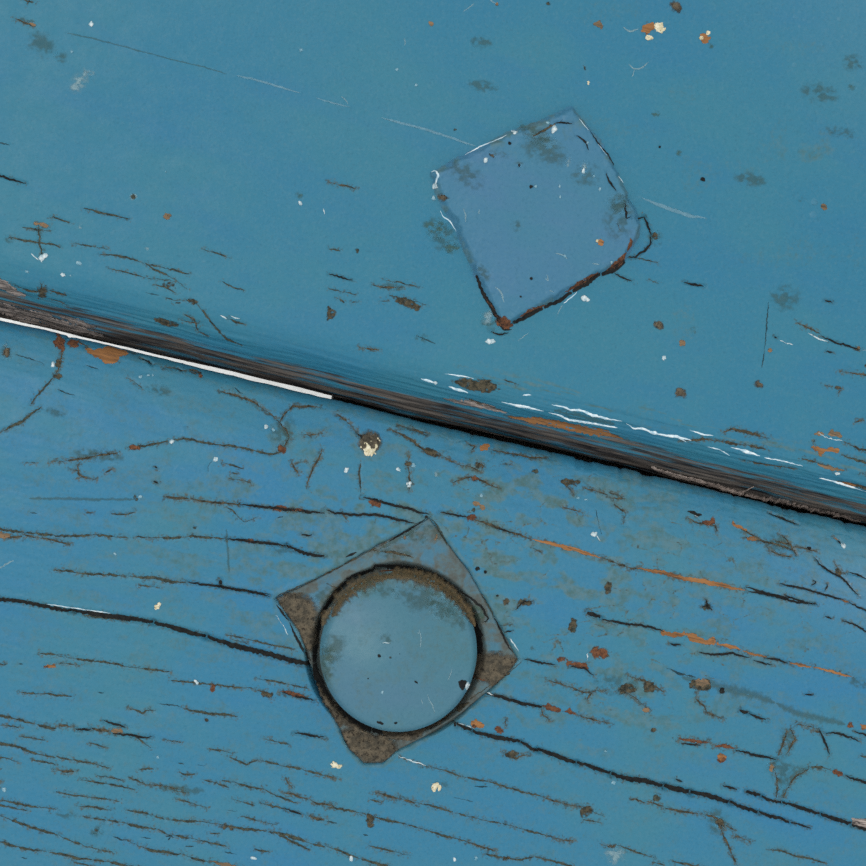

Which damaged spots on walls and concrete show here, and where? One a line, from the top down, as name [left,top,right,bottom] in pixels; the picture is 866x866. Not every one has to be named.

crack [9,208,244,345]
crack [329,274,355,303]
corrosion [485,312,513,335]
peeling [67,339,132,364]
crack [0,388,866,866]
peeling [661,630,852,677]